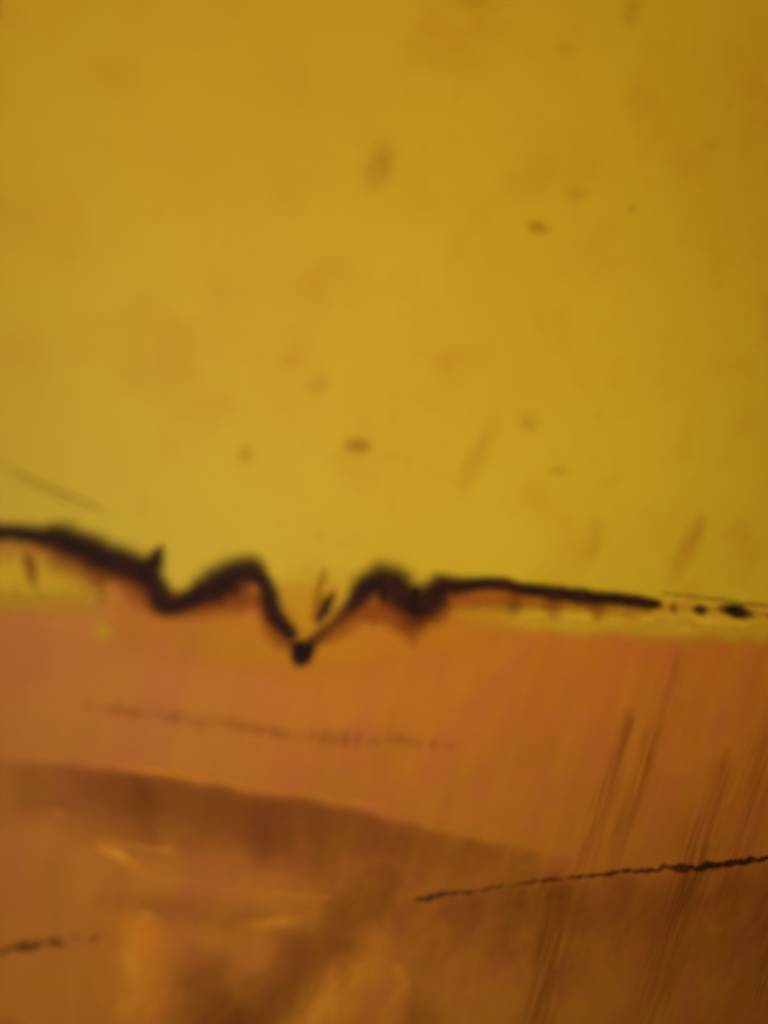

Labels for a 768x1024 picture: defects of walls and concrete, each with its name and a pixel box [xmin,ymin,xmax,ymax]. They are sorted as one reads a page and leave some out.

crack [0,525,661,666]
crack [695,605,750,618]
crack [519,856,768,885]
crack [416,887,492,902]